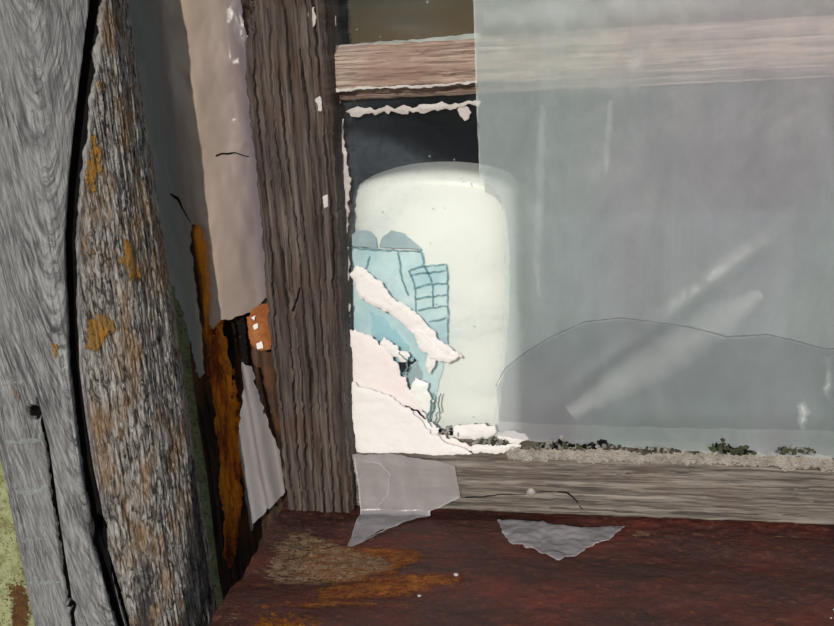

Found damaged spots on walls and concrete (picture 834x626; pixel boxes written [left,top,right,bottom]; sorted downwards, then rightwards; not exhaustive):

peeling [335,80,477,92]
peeling [341,100,481,232]
crack [66,0,130,626]
peeling [194,225,210,333]
peeling [223,303,271,398]
crack [41,417,76,626]
crack [460,491,583,509]
corrosion [251,536,472,626]